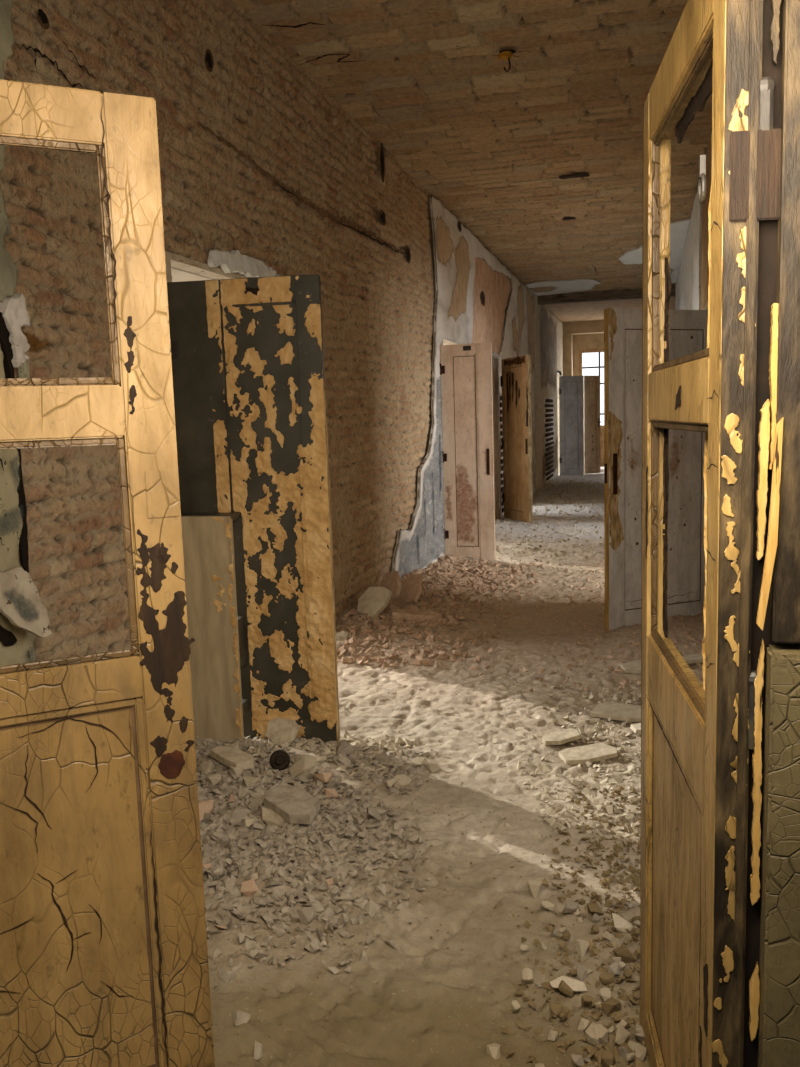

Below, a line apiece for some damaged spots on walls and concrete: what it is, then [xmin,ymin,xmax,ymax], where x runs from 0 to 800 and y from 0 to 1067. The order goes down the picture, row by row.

peeling [0,0,14,80]
peeling [619,245,642,264]
peeling [670,189,702,310]
peeling [123,316,137,414]
peeling [392,196,601,576]
peeling [0,449,23,572]
peeling [205,249,337,739]
peeling [0,613,35,666]
peeling [136,529,195,752]
peeling [150,735,168,758]